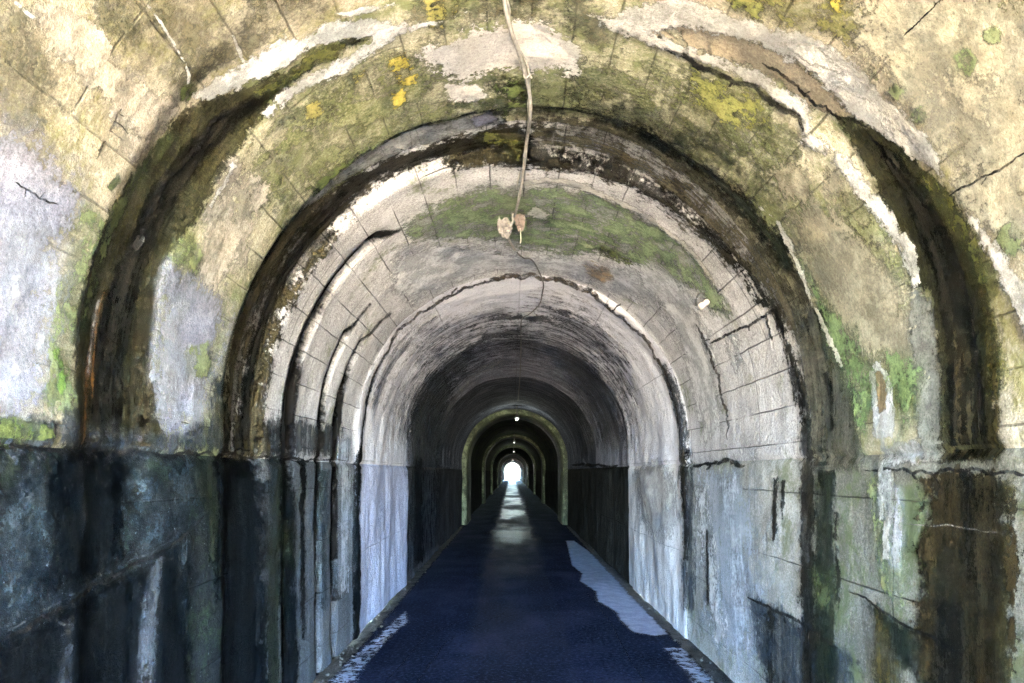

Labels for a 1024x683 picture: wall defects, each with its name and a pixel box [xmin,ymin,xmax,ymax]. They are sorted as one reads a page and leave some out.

peeling [414,18,583,103]
leakage [564,57,605,116]
peeling [649,26,859,122]
crack [904,0,941,36]
crack [16,182,57,204]
rust [80,291,108,445]
leakage [0,76,865,683]
crack [365,272,679,427]
crack [692,309,784,470]
leakage [586,0,1024,560]
crack [664,48,1024,439]
crack [864,467,1024,483]